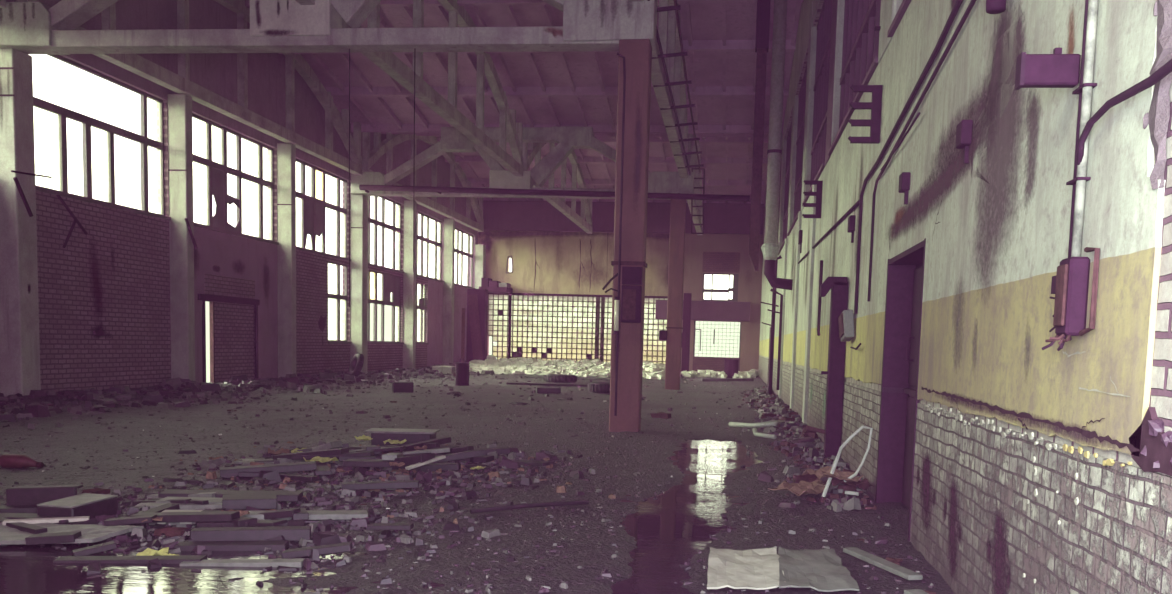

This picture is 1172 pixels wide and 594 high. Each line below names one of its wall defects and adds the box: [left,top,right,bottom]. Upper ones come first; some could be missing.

damp [889,13,1022,238]
damp [1025,96,1039,196]
flaking render [1143,0,1172,190]
spalling [925,404,1172,476]
damp [917,455,961,575]
damp [987,514,1011,594]